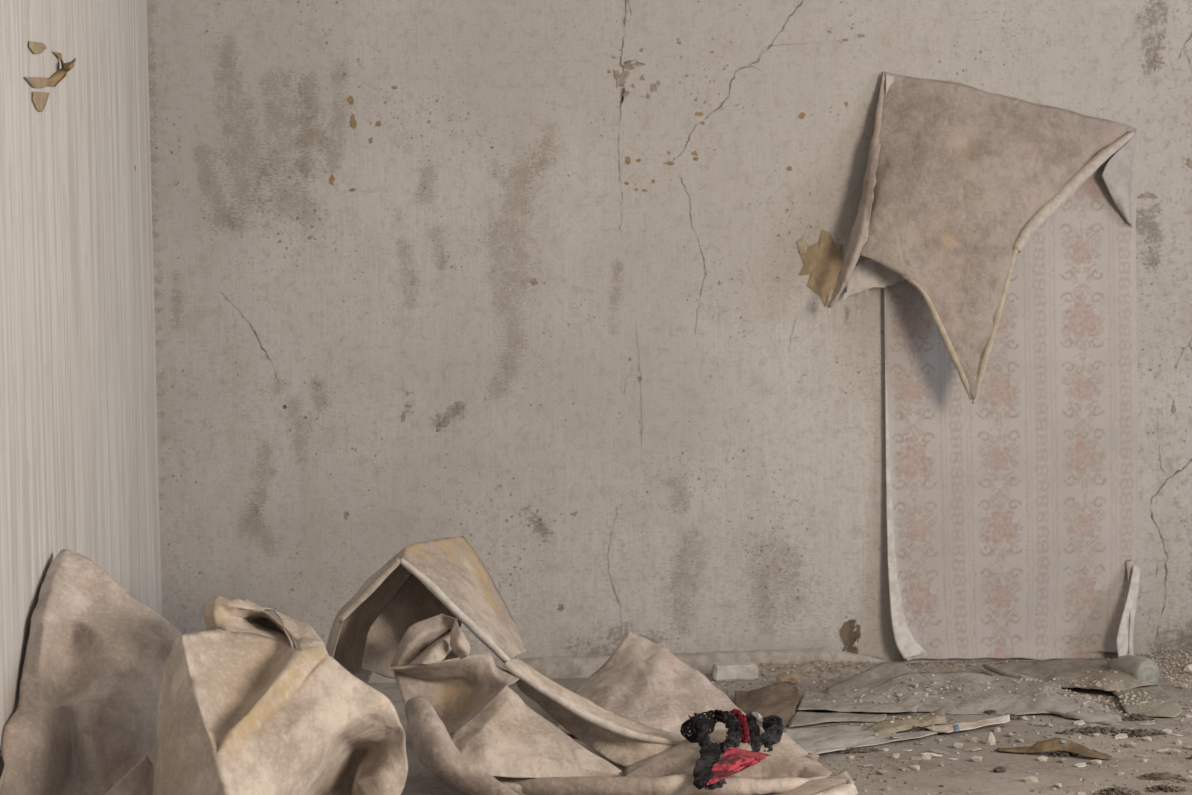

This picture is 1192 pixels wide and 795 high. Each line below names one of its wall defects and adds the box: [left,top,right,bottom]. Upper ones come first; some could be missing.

peeling [24,41,76,112]
crack [221,292,280,384]
crack [618,0,645,237]
crack [676,1,860,346]
peeling [796,229,843,307]
crack [1150,408,1192,641]